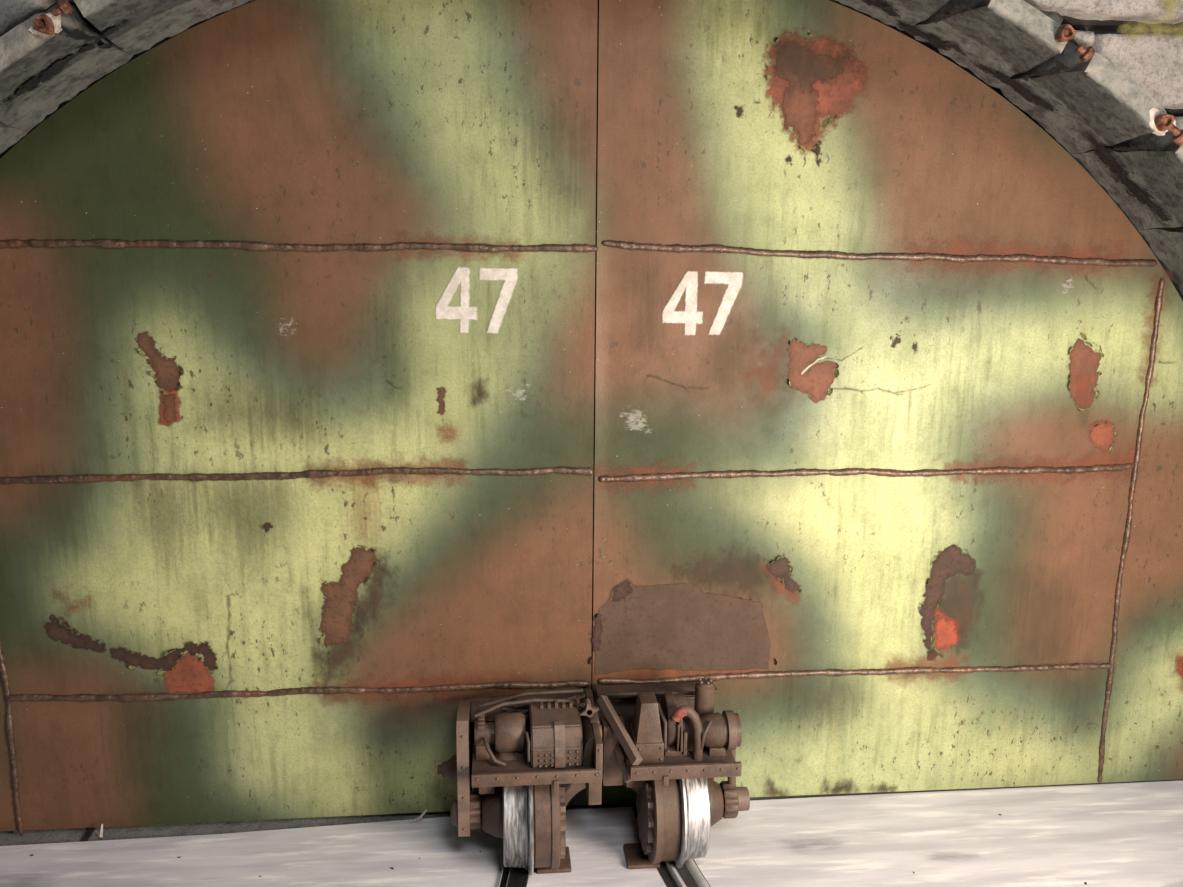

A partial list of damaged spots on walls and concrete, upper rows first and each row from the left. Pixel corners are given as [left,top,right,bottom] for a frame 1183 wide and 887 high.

corrosion [764,32,867,166]